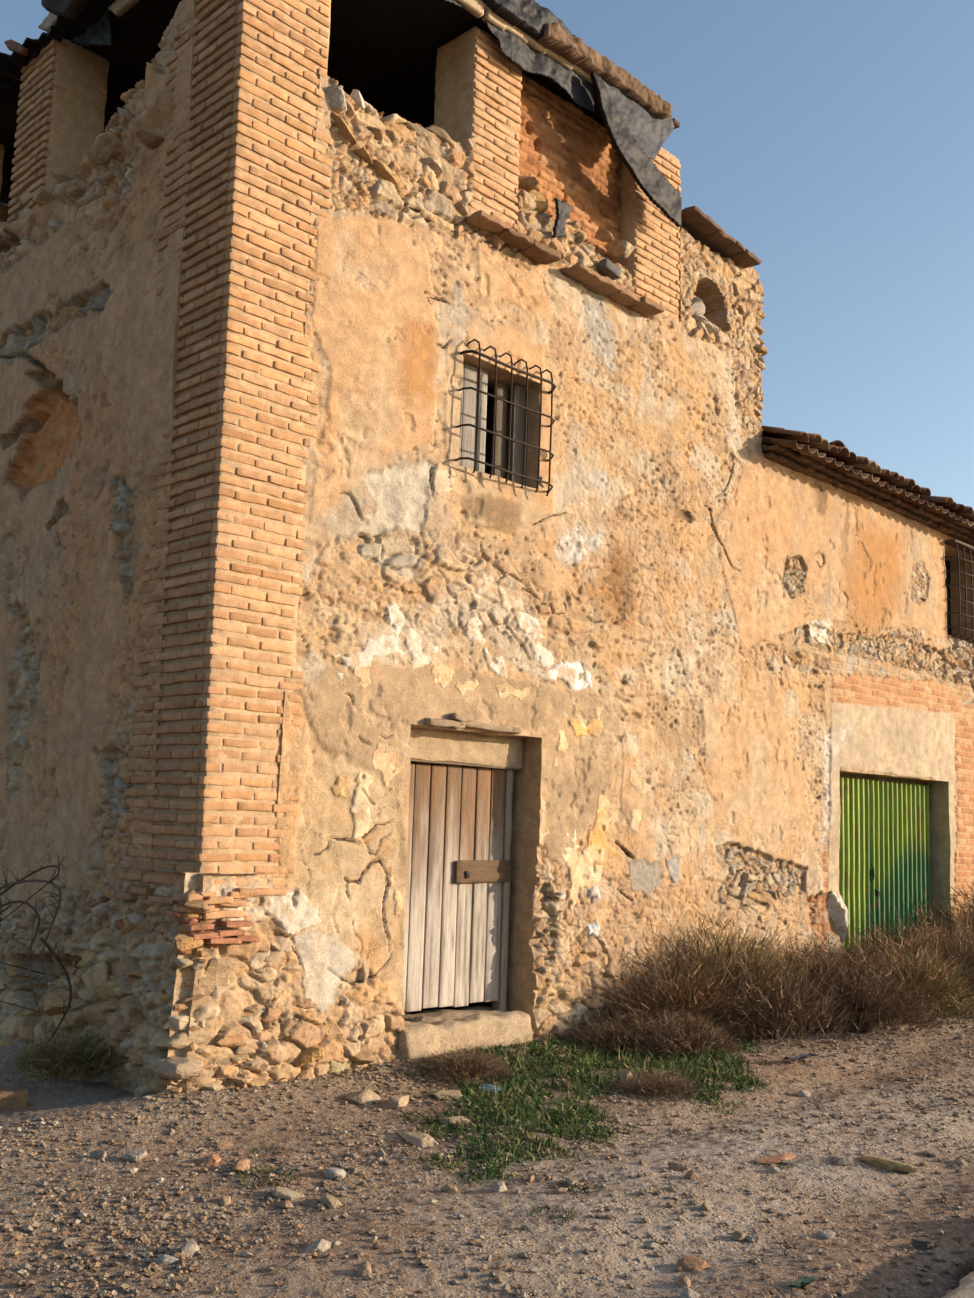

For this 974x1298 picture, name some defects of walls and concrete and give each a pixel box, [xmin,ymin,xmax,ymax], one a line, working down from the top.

spalling [0,415,43,449]
spalling [25,370,68,402]
flaking render [339,454,455,584]
crack [705,457,740,572]
peeling [332,602,479,696]
peeling [454,573,592,700]
flaking render [781,624,974,707]
peeling [548,705,603,784]
flaking render [215,887,358,1014]
crack [313,800,392,985]
flaking render [529,792,680,1023]
flaking render [714,842,839,936]